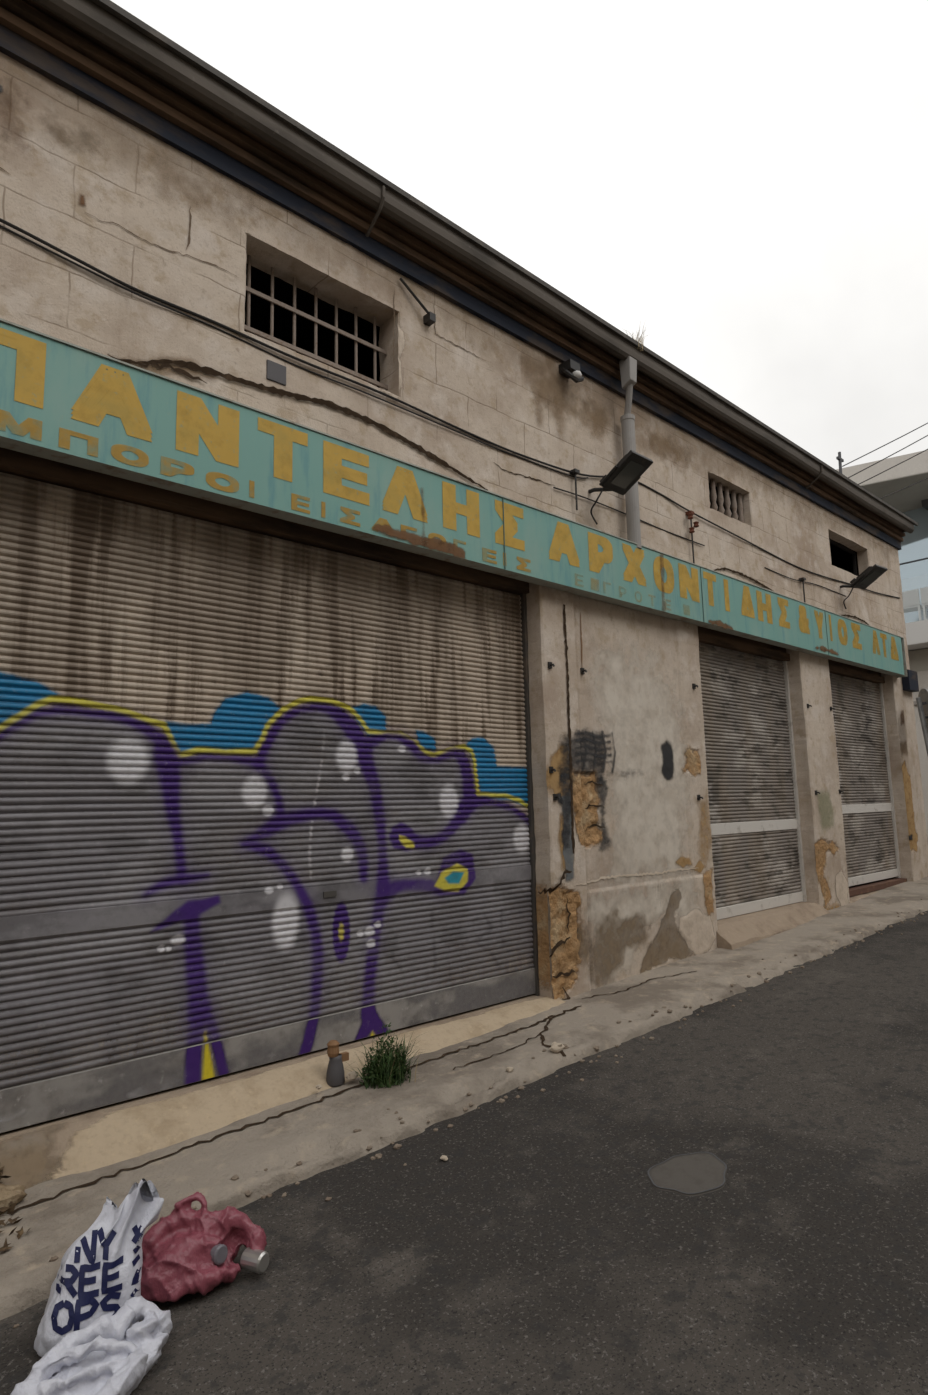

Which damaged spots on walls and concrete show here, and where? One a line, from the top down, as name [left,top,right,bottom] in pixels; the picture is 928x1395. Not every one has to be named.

crack [108,354,551,490]
flaking render [900,742,918,851]
flaking render [51,650,715,1179]
damp [578,889,693,985]
flaking render [814,838,848,910]